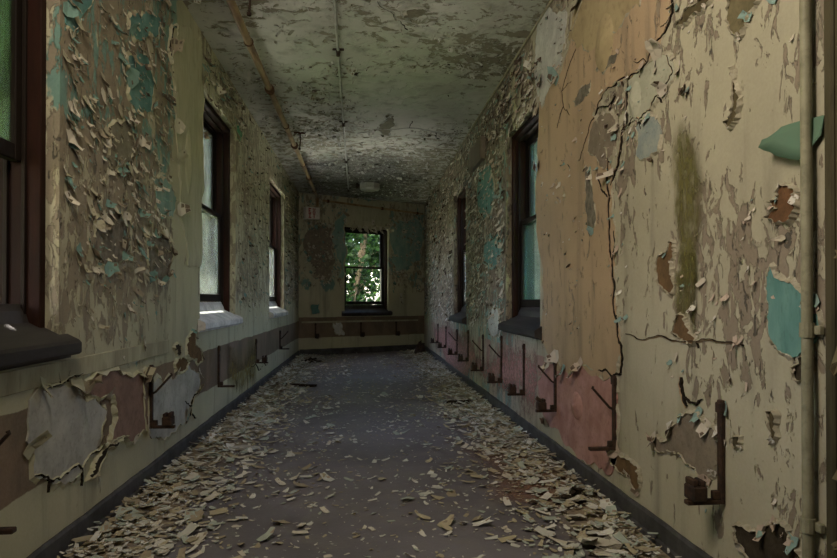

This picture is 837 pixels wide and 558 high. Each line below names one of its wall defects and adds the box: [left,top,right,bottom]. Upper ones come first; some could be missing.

peeling [63,0,387,323]
peeling [230,0,714,497]
crack [557,49,576,127]
crack [579,0,744,377]
spalling [654,238,730,378]
spalling [722,65,744,131]
spalling [740,182,800,244]
peeling [749,262,801,384]
peeling [23,327,205,492]
peeling [57,349,682,558]
spalling [645,406,744,487]
spalling [732,515,802,558]